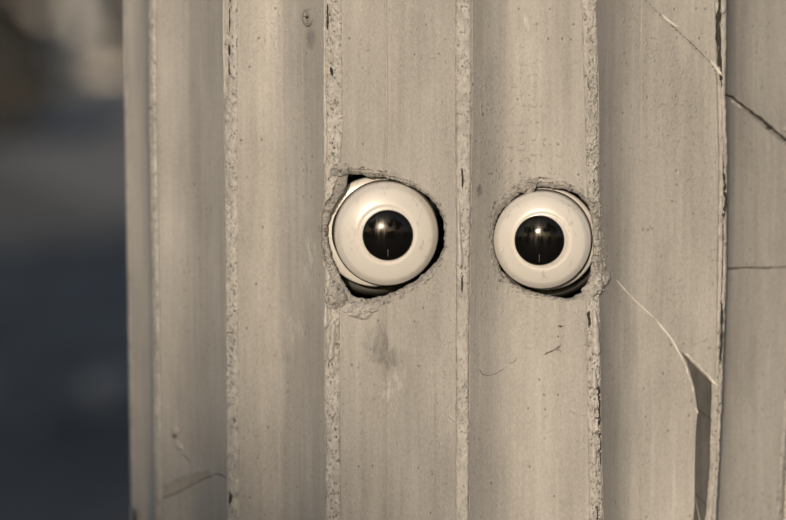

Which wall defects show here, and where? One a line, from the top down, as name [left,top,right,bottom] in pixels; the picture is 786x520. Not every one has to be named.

crack [646,0,786,141]
crack [720,161,728,229]
crack [719,250,786,368]